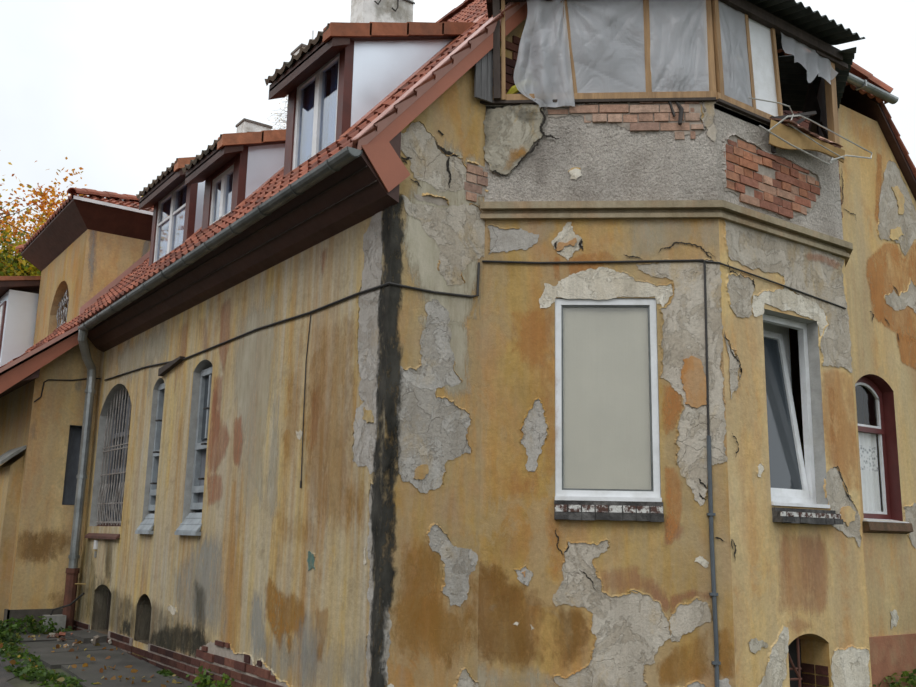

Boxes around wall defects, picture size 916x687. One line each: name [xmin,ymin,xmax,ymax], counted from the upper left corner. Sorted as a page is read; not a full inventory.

peeling [401,120,539,286]
crack [490,107,566,177]
flaking render [544,101,822,219]
peeling [876,160,916,256]
corrosion [208,382,242,502]
peeling [352,211,394,687]
peeling [397,299,472,493]
damp [369,141,536,687]
peeling [519,396,550,472]
peeling [539,220,853,506]
peeling [426,522,478,607]
peeling [552,538,713,687]